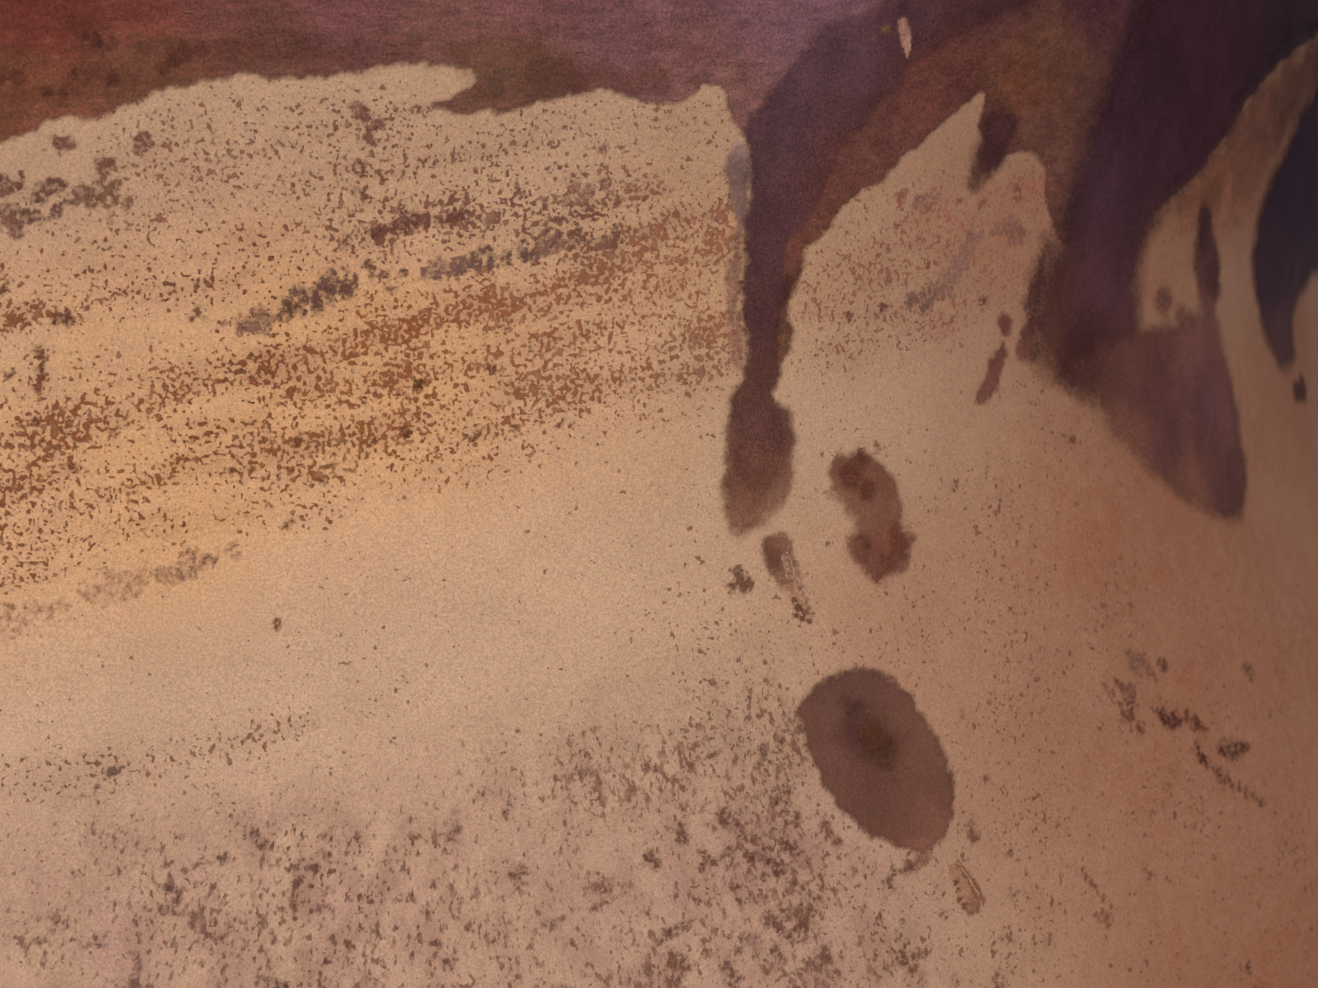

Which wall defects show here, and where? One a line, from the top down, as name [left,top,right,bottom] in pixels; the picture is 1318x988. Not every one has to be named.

corrosion [0,81,749,595]
damp [0,0,1318,532]
damp [825,440,915,580]
damp [14,903,100,979]
damp [91,809,369,988]
damp [311,809,592,988]
damp [473,646,954,988]